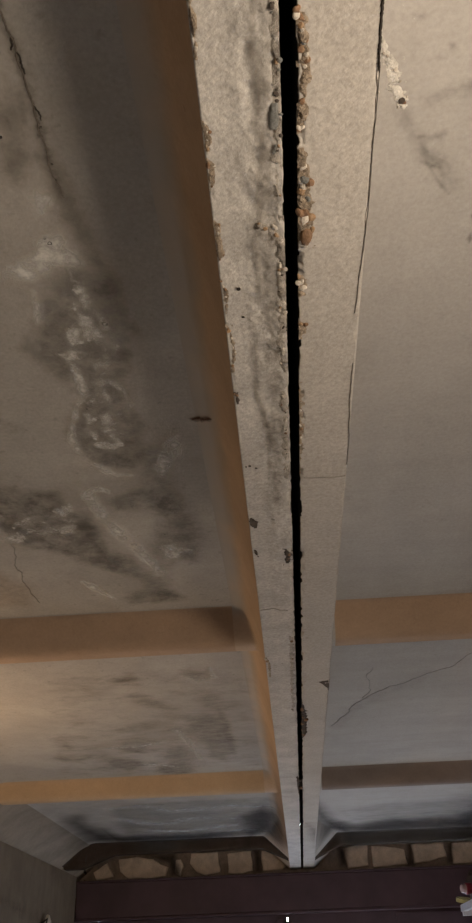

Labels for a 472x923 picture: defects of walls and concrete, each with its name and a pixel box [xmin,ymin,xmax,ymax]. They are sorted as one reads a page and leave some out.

crack [0,10,64,198]
leakage [13,238,79,279]
leakage [46,279,138,464]
spalling [267,0,283,197]
spalling [255,215,309,372]
spalling [292,4,312,134]
spalling [295,147,316,248]
crack [304,363,354,479]
crack [354,0,384,313]
crack [331,653,472,726]